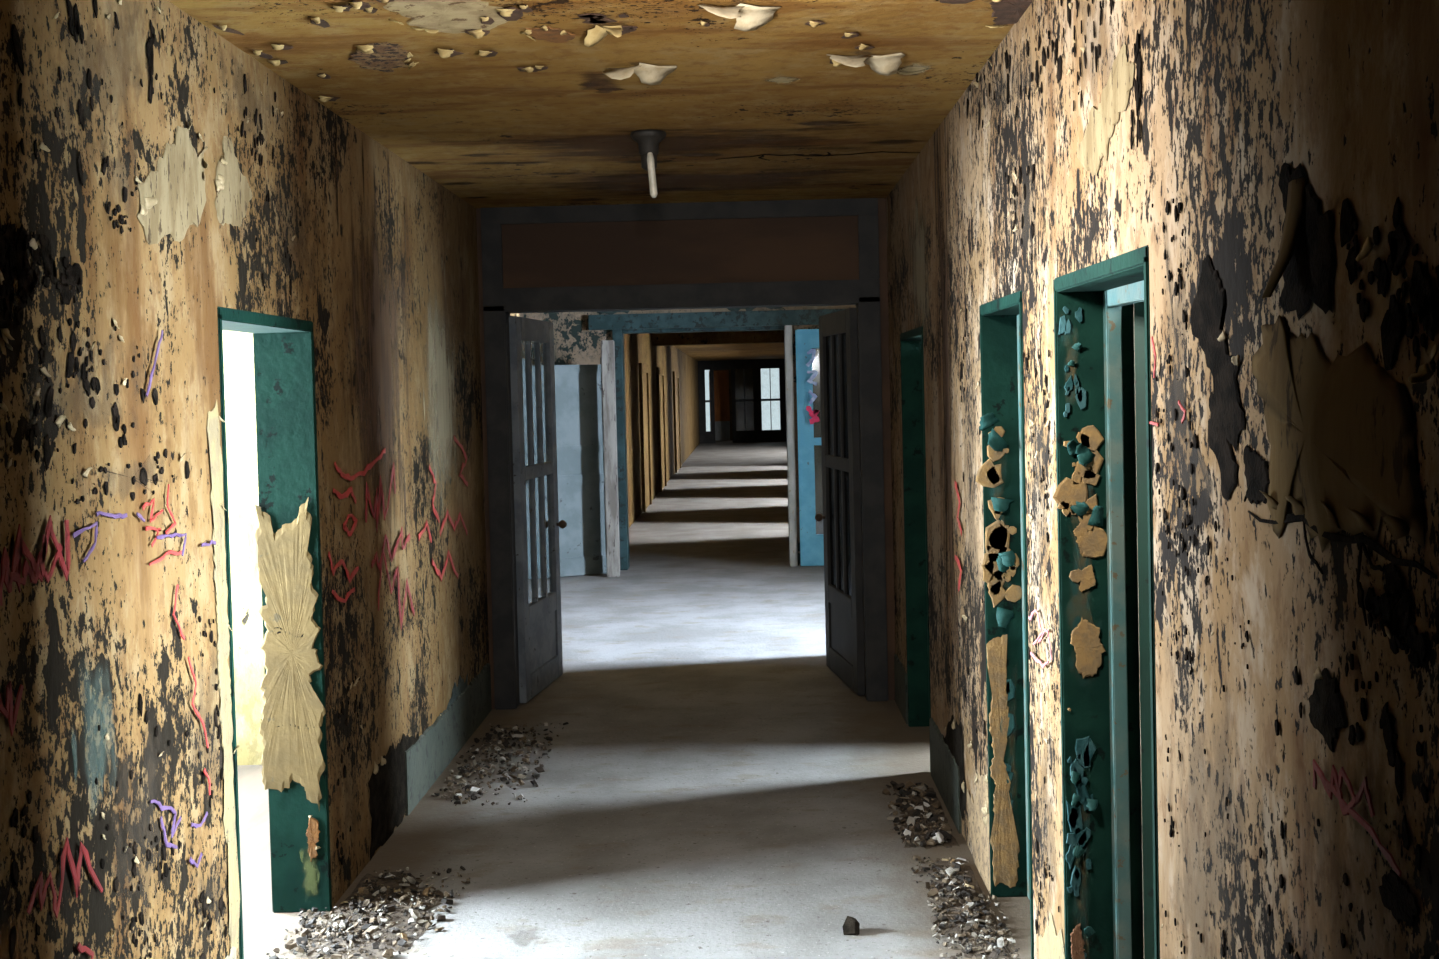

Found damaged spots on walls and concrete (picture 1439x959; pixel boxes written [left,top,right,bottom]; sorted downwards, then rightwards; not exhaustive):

peeling [310,0,533,59]
peeling [577,13,638,47]
peeling [602,63,677,85]
peeling [697,3,781,31]
peeling [827,32,928,76]
peeling [1262,163,1439,384]
peeling [0,219,158,471]
peeling [127,449,190,501]
peeling [943,306,1107,959]
peeling [255,497,363,865]
peeling [101,824,181,898]
peeling [112,912,156,959]